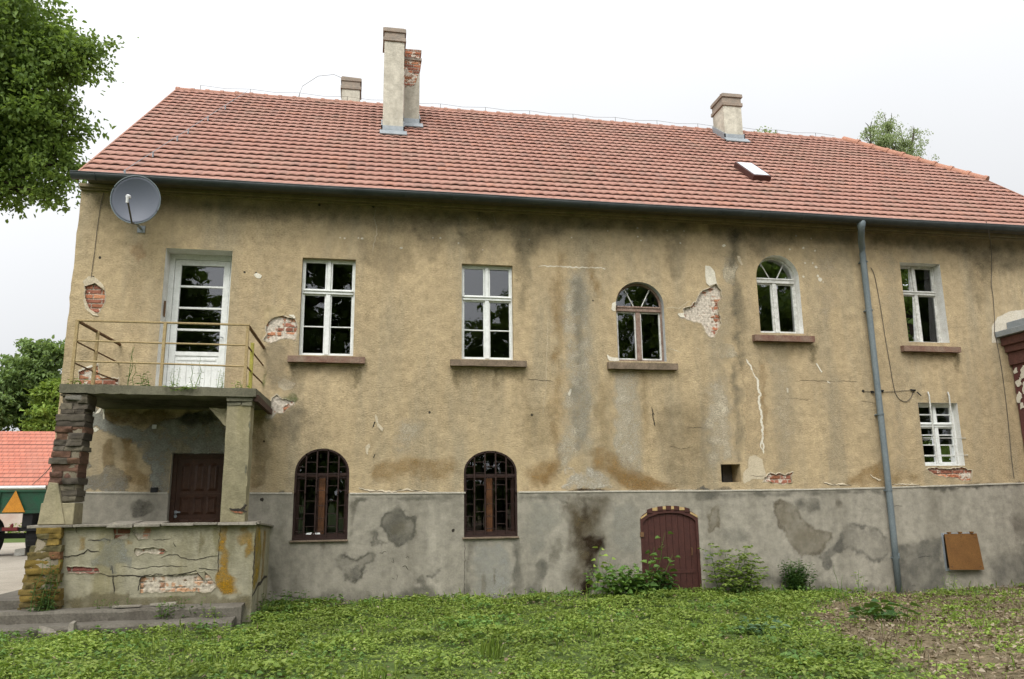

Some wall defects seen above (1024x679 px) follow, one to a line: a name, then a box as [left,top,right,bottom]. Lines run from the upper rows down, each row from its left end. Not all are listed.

spalling [404,49,421,87]
spalling [83,276,106,316]
spalling [678,266,723,338]
spalling [262,305,298,344]
spalling [78,363,120,385]
spalling [264,394,296,420]
crack [746,359,765,477]
damp [84,409,226,492]
damp [562,375,657,586]
spalling [926,466,973,482]
crack [63,410,251,592]
spalling [138,570,217,594]